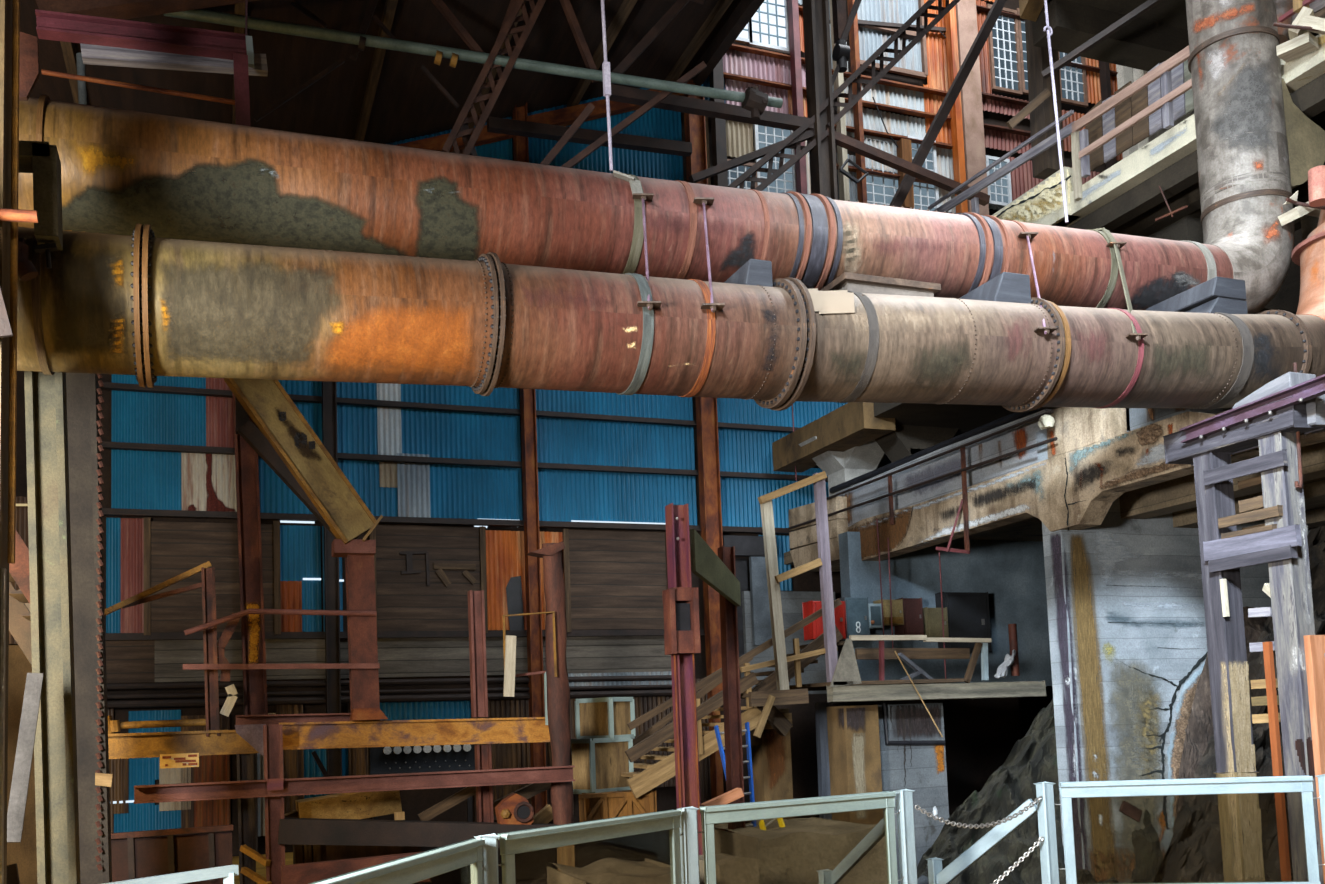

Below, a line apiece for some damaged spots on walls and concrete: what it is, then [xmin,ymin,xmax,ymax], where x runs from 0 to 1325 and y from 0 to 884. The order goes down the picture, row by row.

damp [1051,531,1198,883]
crack [1108,622,1207,830]